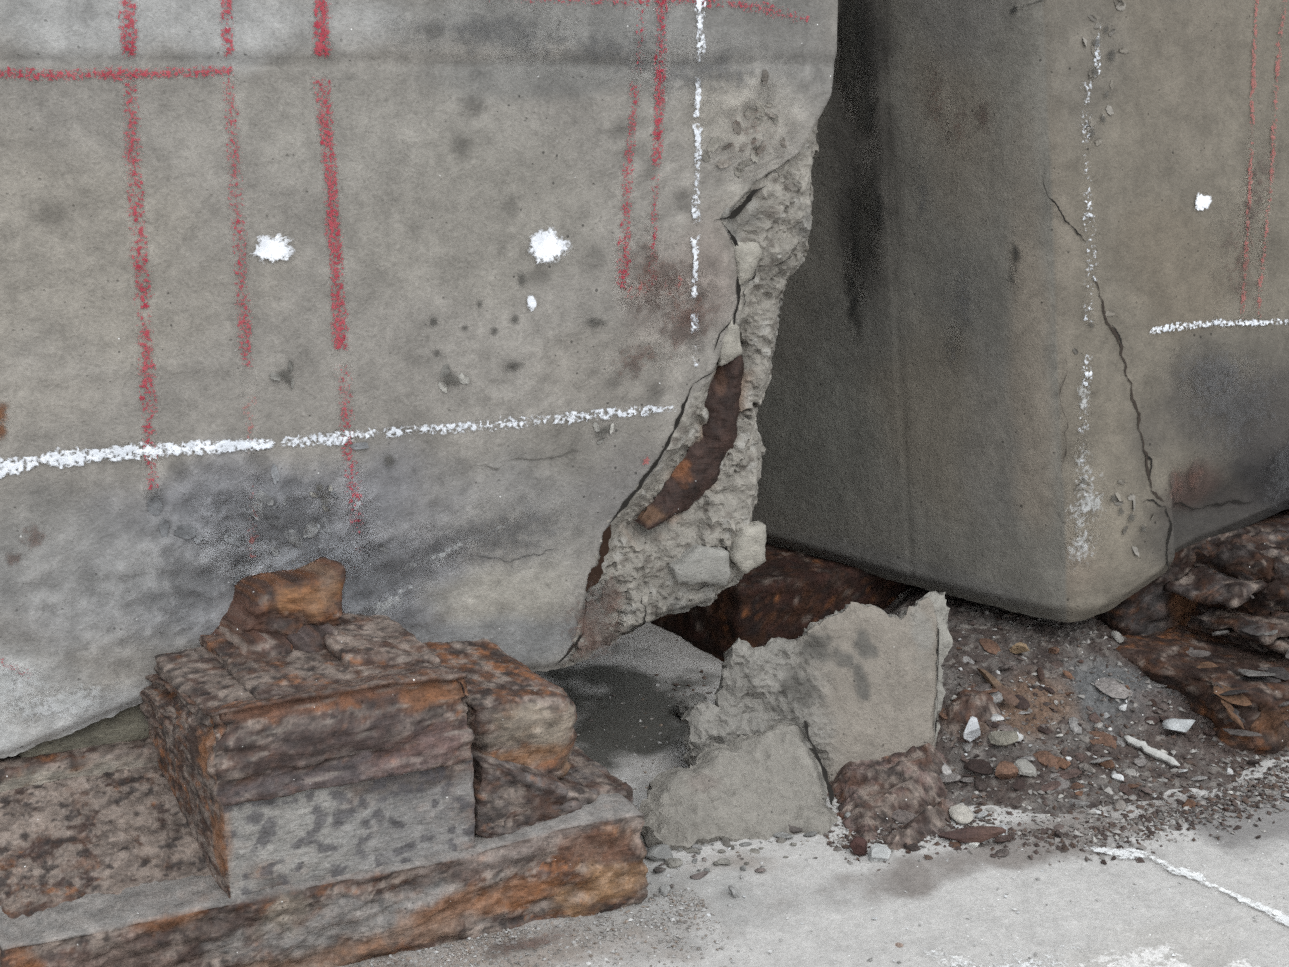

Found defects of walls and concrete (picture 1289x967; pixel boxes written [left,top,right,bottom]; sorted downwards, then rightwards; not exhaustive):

damp [837,0,874,133]
crack [1043,182,1086,242]
rust [638,256,708,346]
spalling [563,101,819,668]
crack [1059,354,1068,479]
crack [1093,275,1253,573]